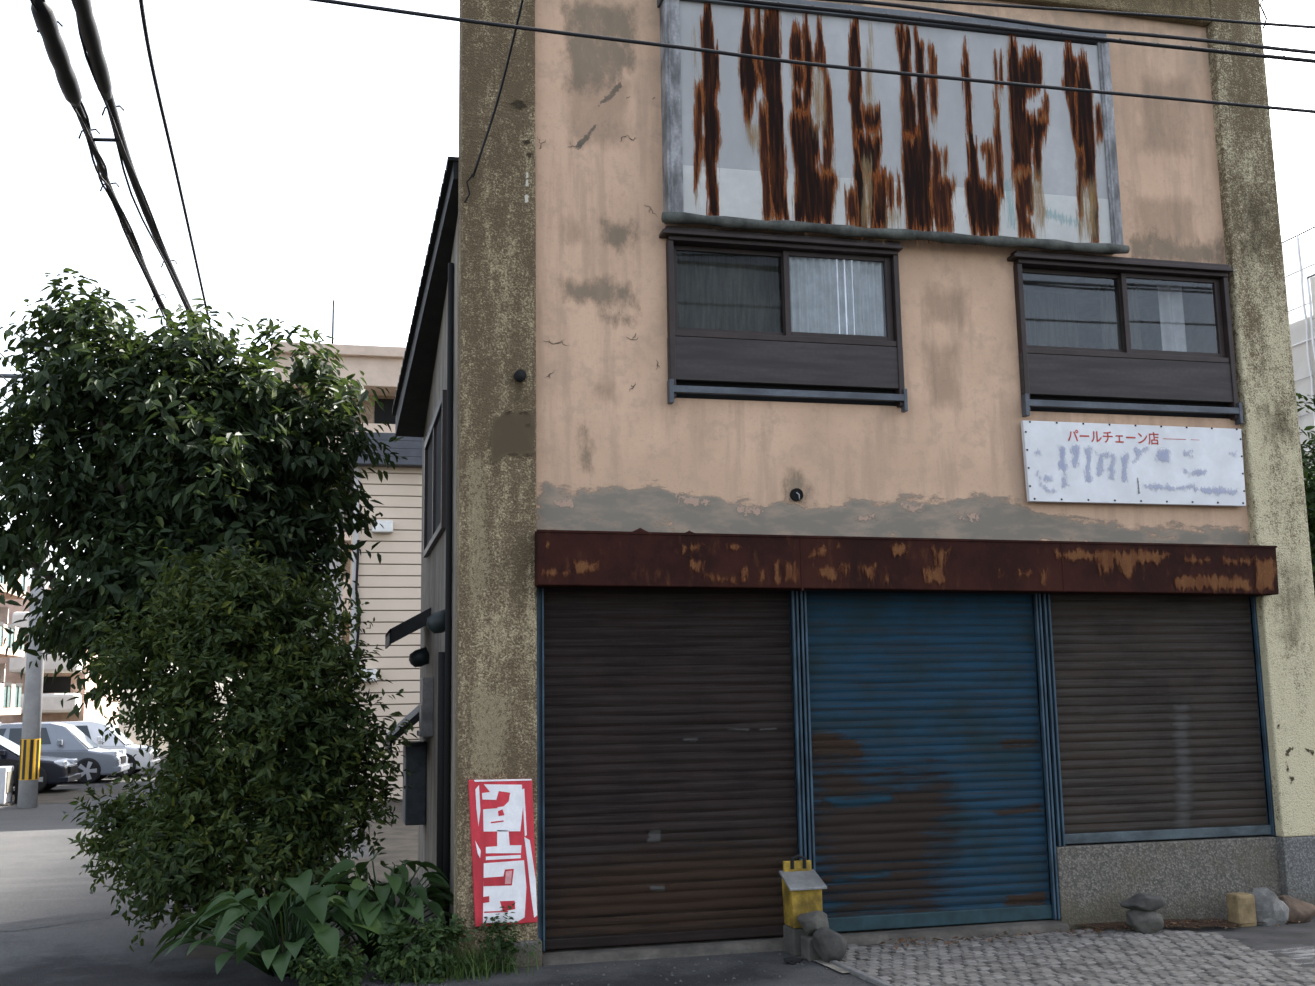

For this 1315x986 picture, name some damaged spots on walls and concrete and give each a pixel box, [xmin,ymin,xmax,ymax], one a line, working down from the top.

water stain [562,3,634,88]
corrosion [693,3,723,216]
corrosion [738,7,1103,246]
peeling [536,481,1277,593]
corrosion [795,733,965,916]
corrosion [1005,892,1046,905]